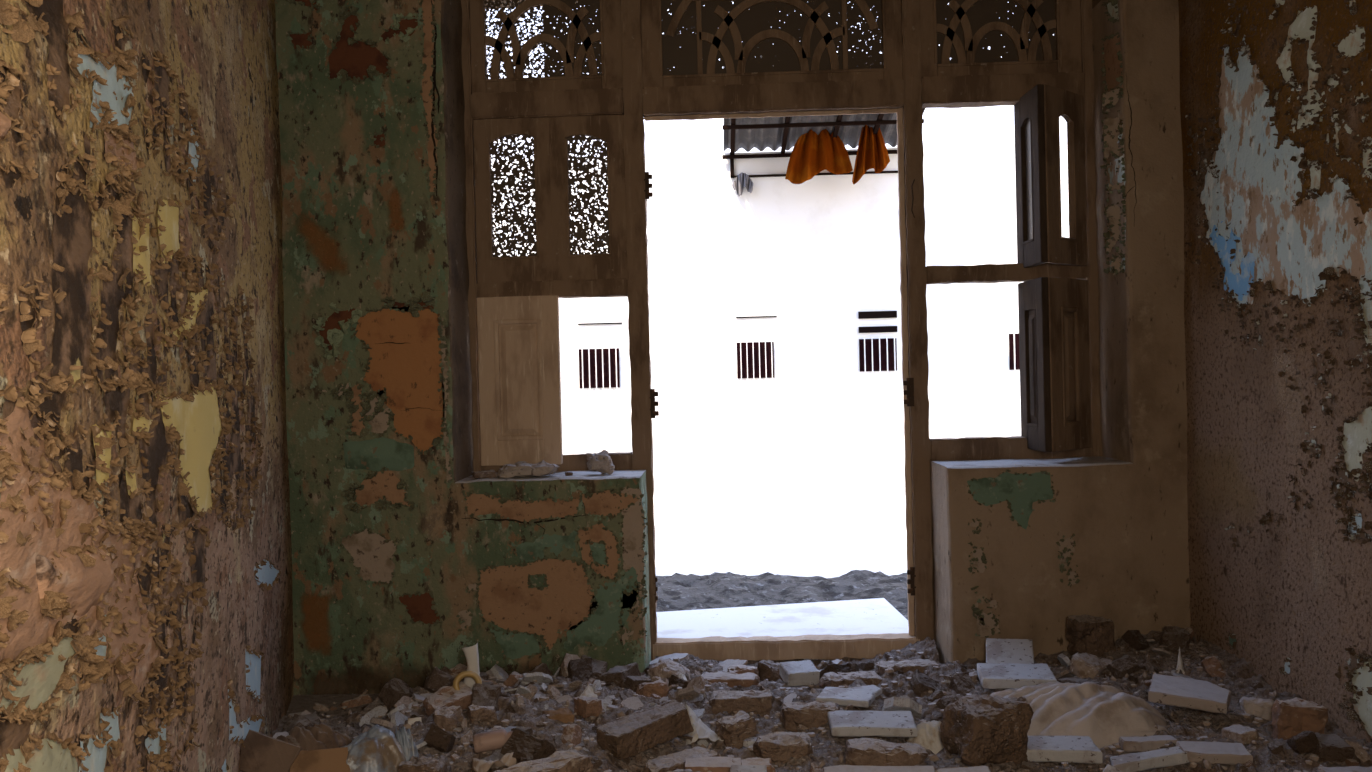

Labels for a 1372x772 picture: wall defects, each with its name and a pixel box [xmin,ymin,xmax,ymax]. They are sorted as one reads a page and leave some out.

peeling [1196,0,1372,547]
peeling [254,557,281,591]
peeling [312,291,649,727]
peeling [967,470,1056,638]
peeling [1334,645,1372,746]